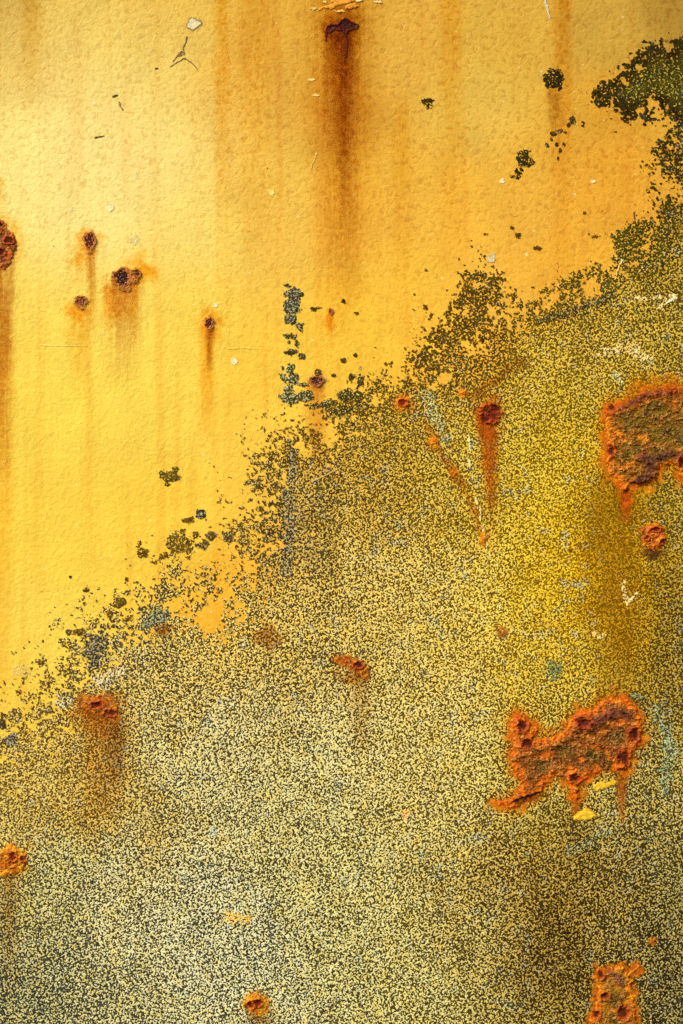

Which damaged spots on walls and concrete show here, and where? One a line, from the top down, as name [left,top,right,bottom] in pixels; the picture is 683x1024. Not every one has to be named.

corrosion [324,17,359,58]
corrosion [0,220,17,270]
corrosion [81,229,97,254]
corrosion [110,266,141,292]
corrosion [73,295,89,311]
corrosion [204,315,215,331]
corrosion [478,400,505,434]
corrosion [598,382,683,509]
corrosion [490,694,650,820]
corrosion [0,843,27,877]
corrosion [242,990,269,1016]
corrosion [587,961,644,1024]